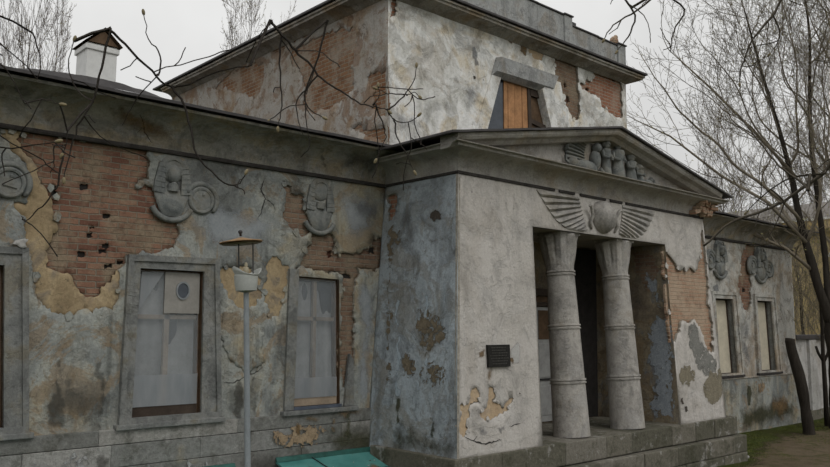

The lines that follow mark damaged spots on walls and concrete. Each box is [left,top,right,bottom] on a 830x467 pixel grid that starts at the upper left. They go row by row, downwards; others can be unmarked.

flaking render [213,62,264,98]
flaking render [273,27,357,114]
flaking render [368,71,391,116]
flaking render [553,59,622,121]
flaking render [0,129,179,321]
peeling [220,256,289,319]
flaking render [281,181,401,387]
peeling [401,309,446,388]
flaking render [633,238,723,405]
peeling [273,425,327,448]
peeling [459,387,521,437]